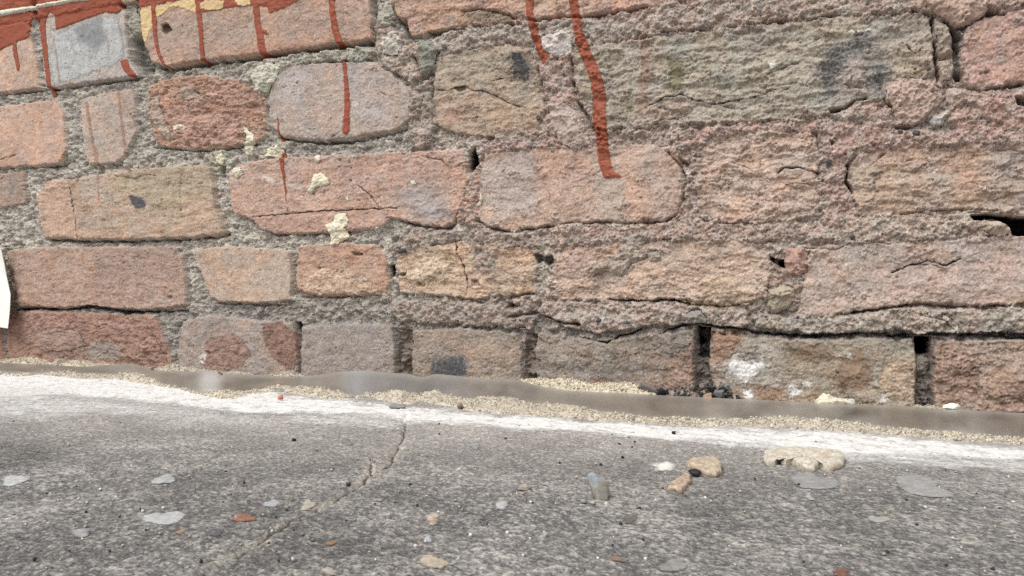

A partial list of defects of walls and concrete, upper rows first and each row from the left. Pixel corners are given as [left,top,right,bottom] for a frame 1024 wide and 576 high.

crack [891,258,962,273]
crack [613,297,687,305]
crack [202,423,407,576]